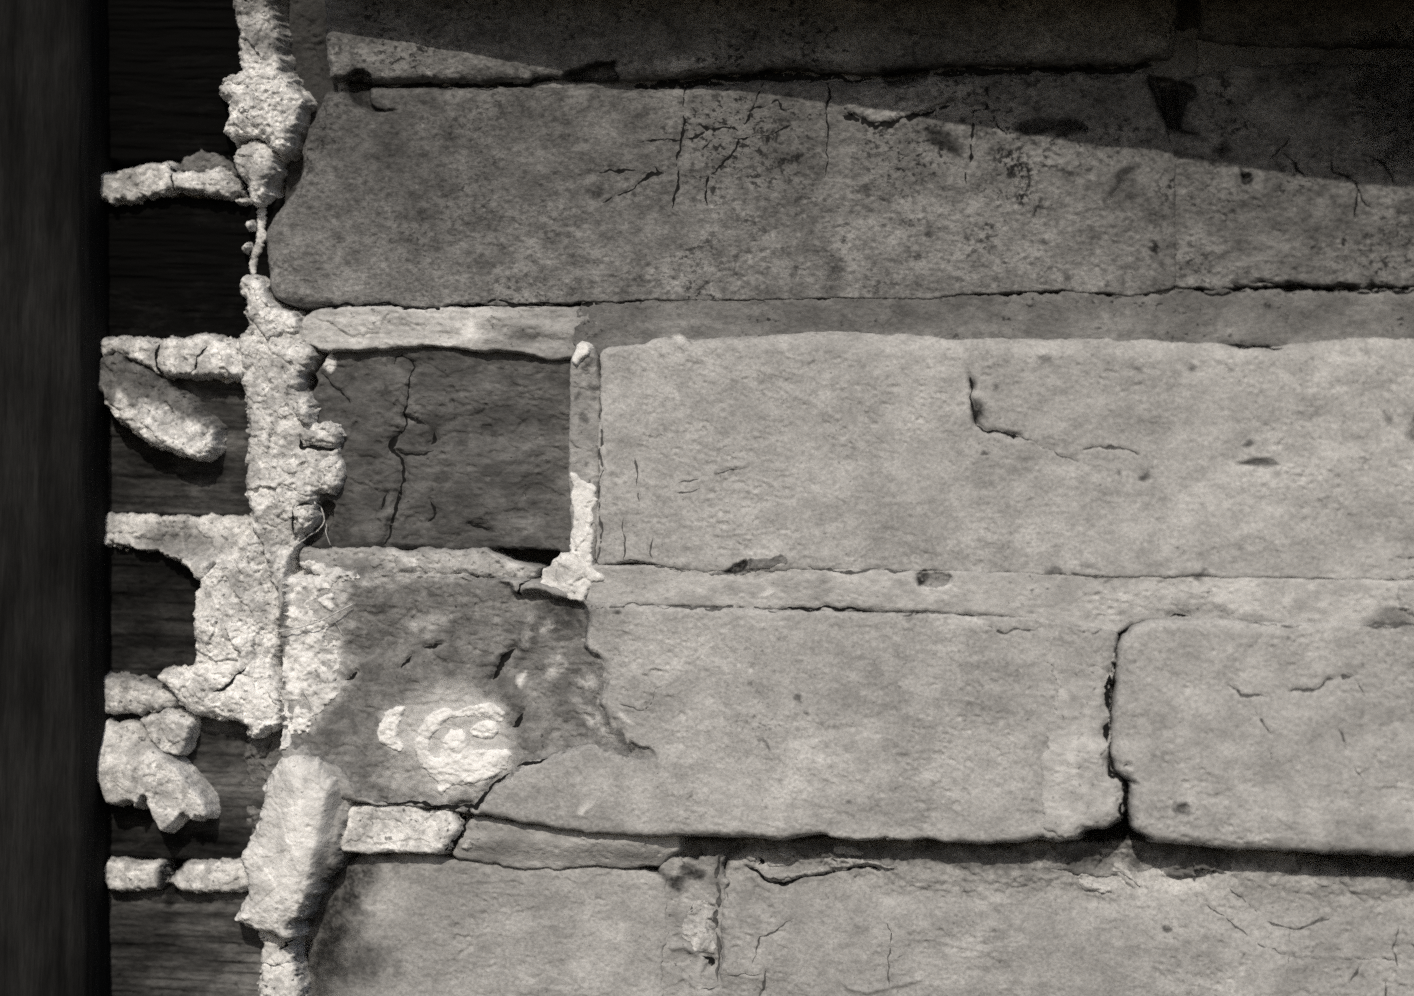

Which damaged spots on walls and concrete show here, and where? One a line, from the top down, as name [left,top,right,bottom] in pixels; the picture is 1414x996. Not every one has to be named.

crack [374,77,558,90]
crack [599,62,1153,208]
crack [381,355,437,545]
crack [969,376,1139,461]
crack [704,852,879,996]
crack [887,924,900,983]